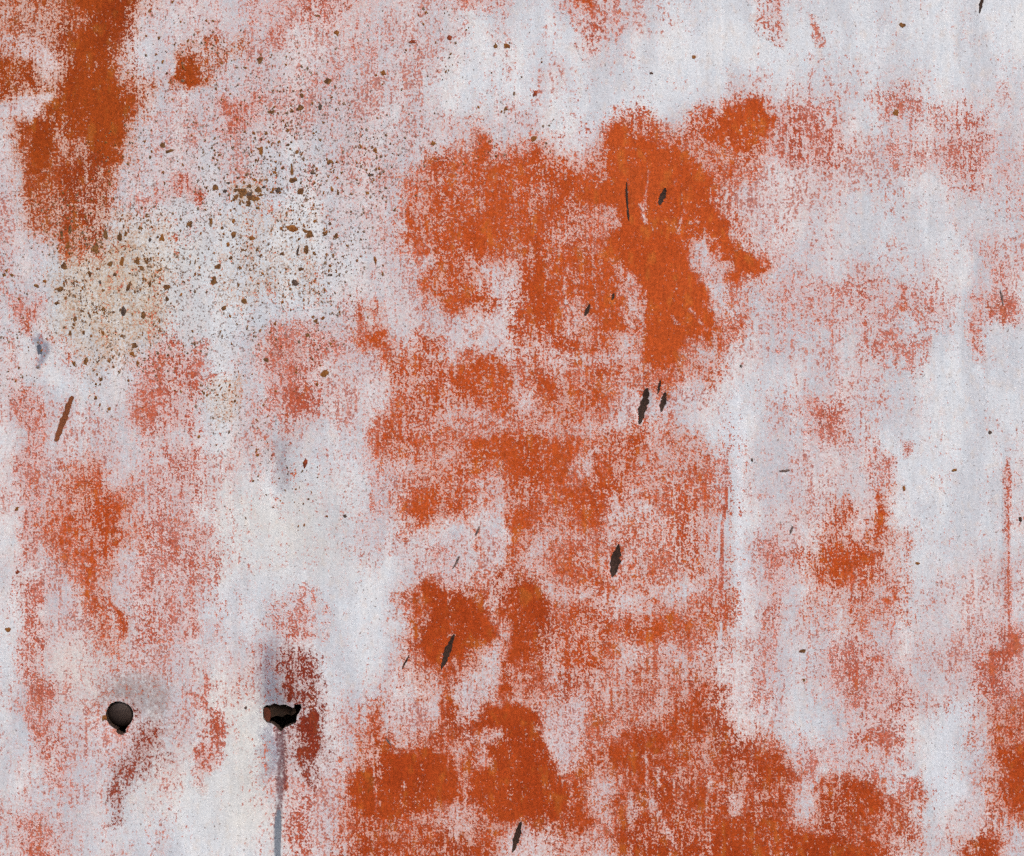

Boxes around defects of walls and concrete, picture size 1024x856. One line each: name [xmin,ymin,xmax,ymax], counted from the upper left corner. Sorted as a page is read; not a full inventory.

corrosion [0,0,377,407]
corrosion [0,367,152,796]
corrosion [174,363,278,464]
damp [272,726,289,856]
corrosion [282,75,936,856]
corrosion [948,456,1024,856]